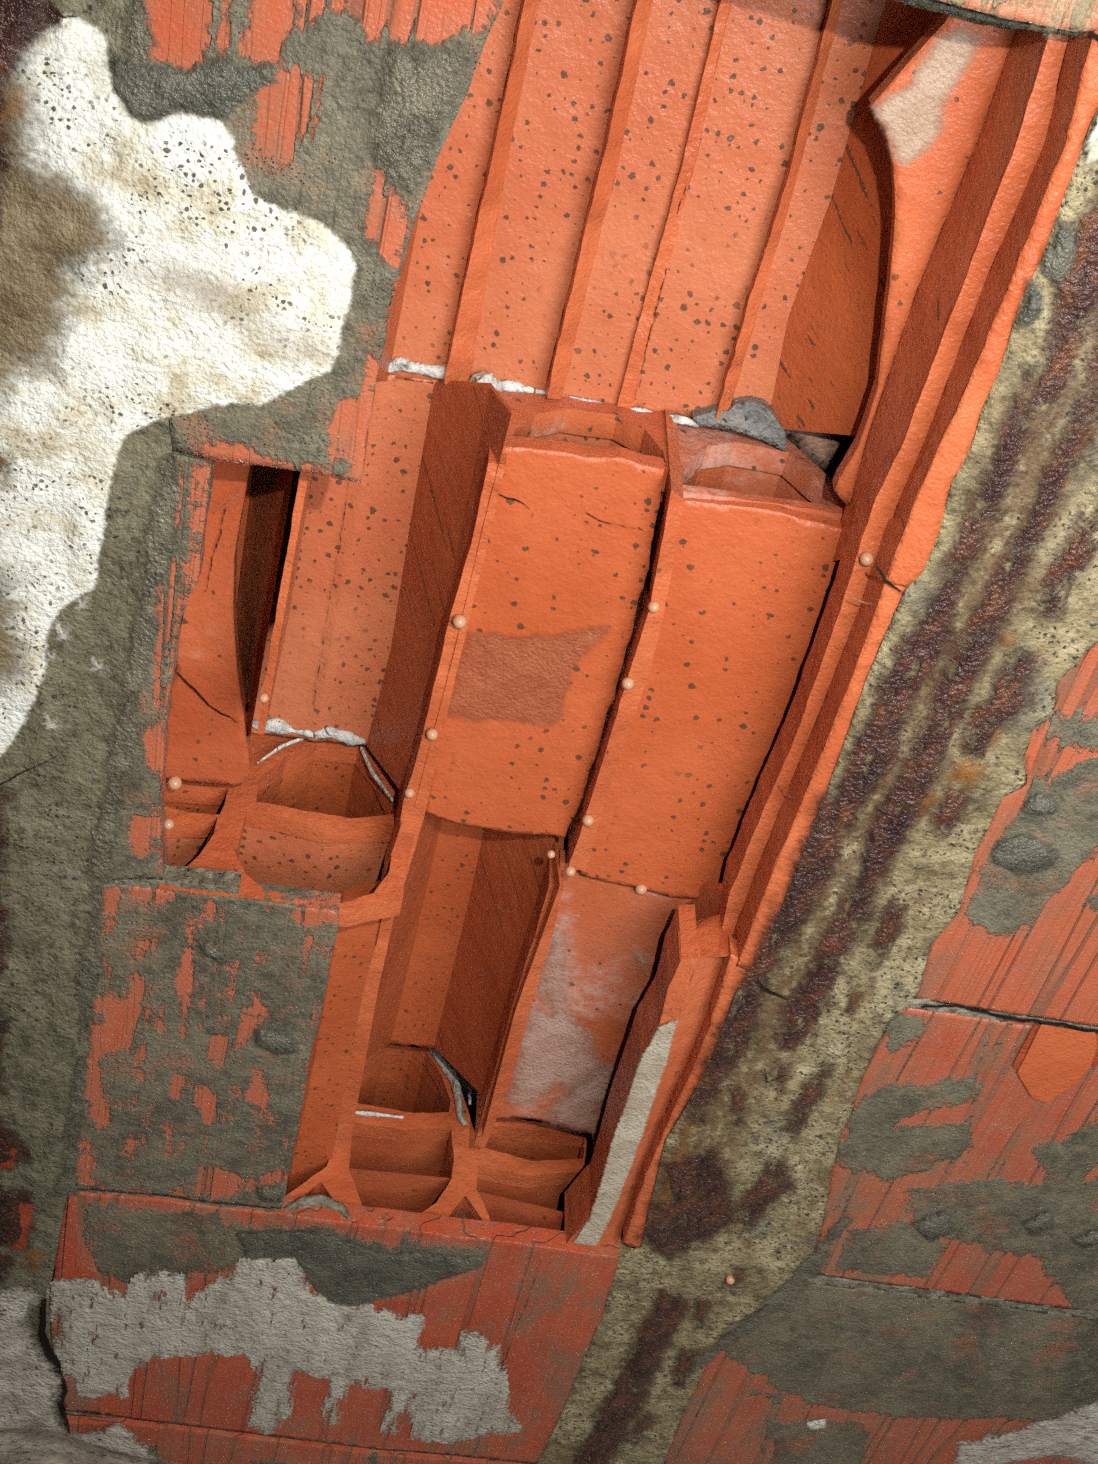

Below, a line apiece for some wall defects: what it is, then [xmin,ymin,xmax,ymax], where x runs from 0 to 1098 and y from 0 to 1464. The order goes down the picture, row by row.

spalling [366,43,471,196]
spalling [1087,118,1098,163]
spalling [1017,221,1077,329]
water stain [0,13,356,756]
rust [637,203,1098,1261]
crack [921,1004,1098,1033]
spalling [1013,1024,1098,1103]
rust [0,1119,35,1169]
rust [0,1191,41,1280]
crack [39,1298,71,1435]
water stain [0,1257,524,1464]
rust [574,1288,712,1464]